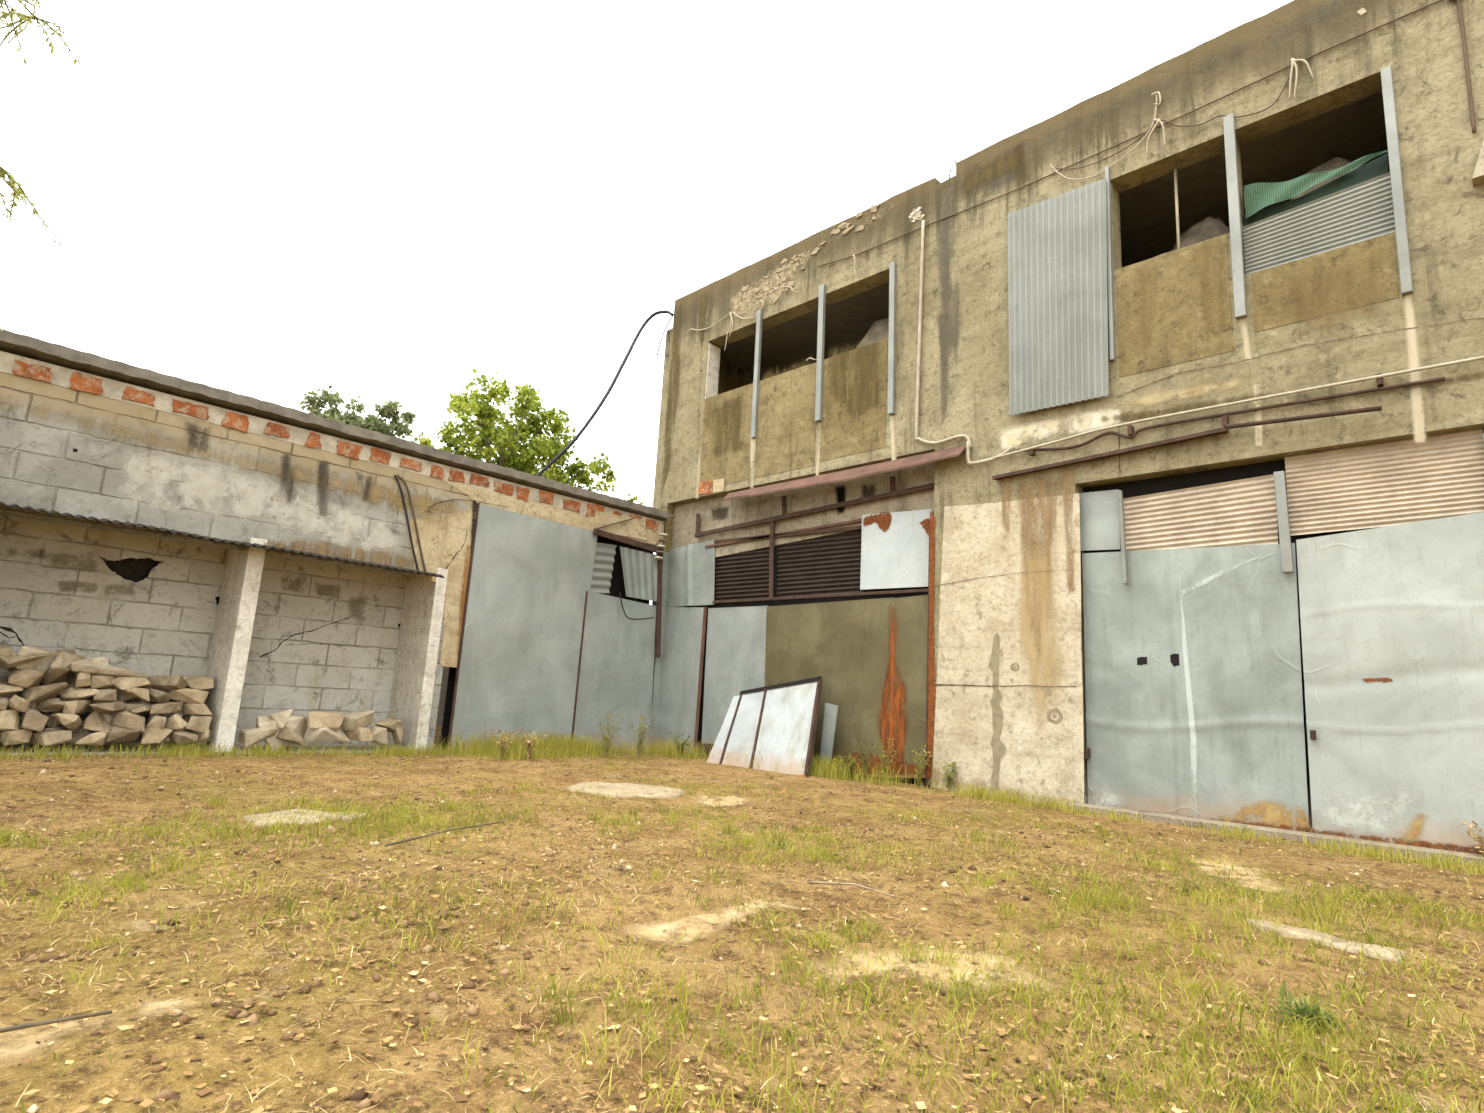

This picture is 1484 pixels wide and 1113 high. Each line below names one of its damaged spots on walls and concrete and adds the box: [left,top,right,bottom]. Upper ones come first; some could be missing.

peeling [730,204,880,319]
crack [0,626,24,646]
corrosion [814,511,936,778]